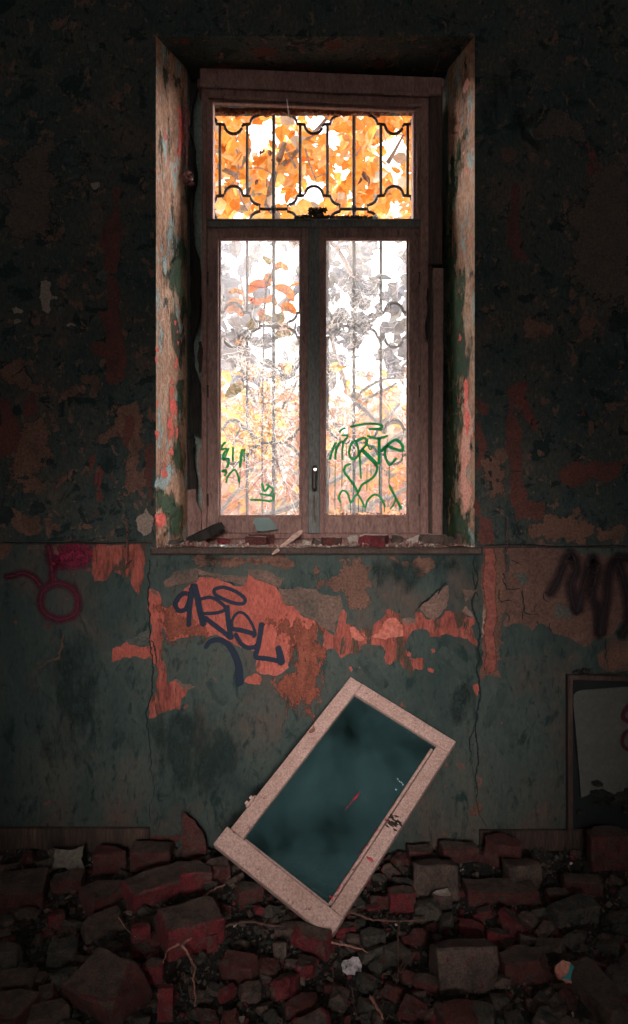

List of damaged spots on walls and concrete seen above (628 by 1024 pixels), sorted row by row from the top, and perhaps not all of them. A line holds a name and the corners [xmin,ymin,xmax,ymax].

peeling [6,321,628,720]
crack [1,541,159,816]
crack [469,544,628,829]